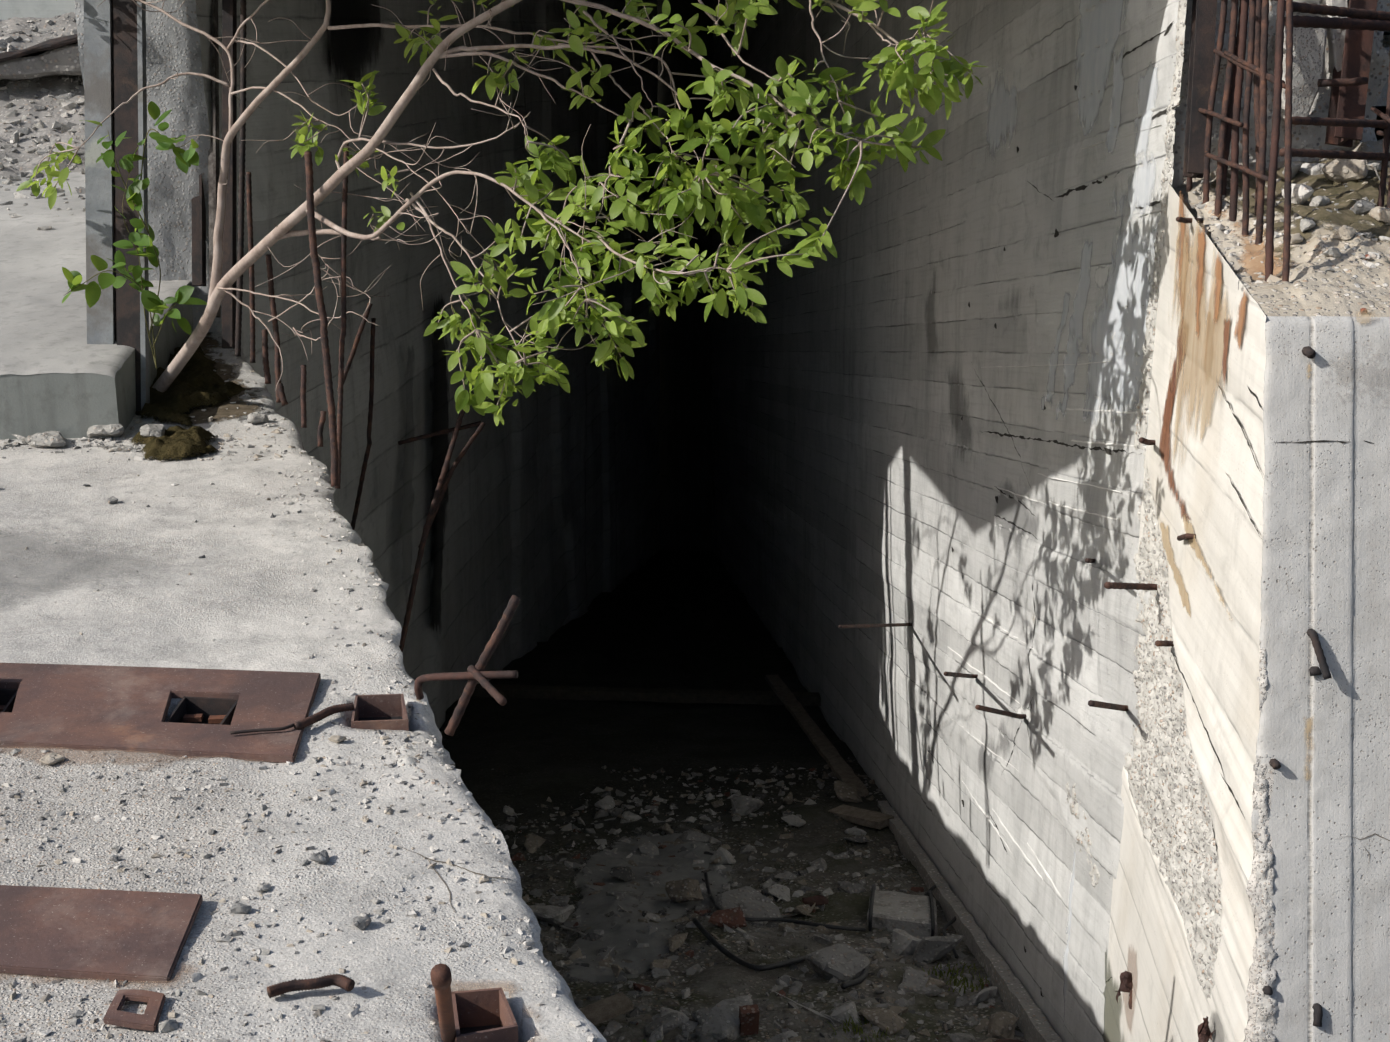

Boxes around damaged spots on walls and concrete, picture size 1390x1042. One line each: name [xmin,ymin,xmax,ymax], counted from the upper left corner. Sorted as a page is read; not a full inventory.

spalling [1123,0,1222,999]
corrosion [1159,197,1298,616]
spalling [1257,641,1269,711]
spalling [1253,753,1278,1042]
crack [1337,833,1390,868]